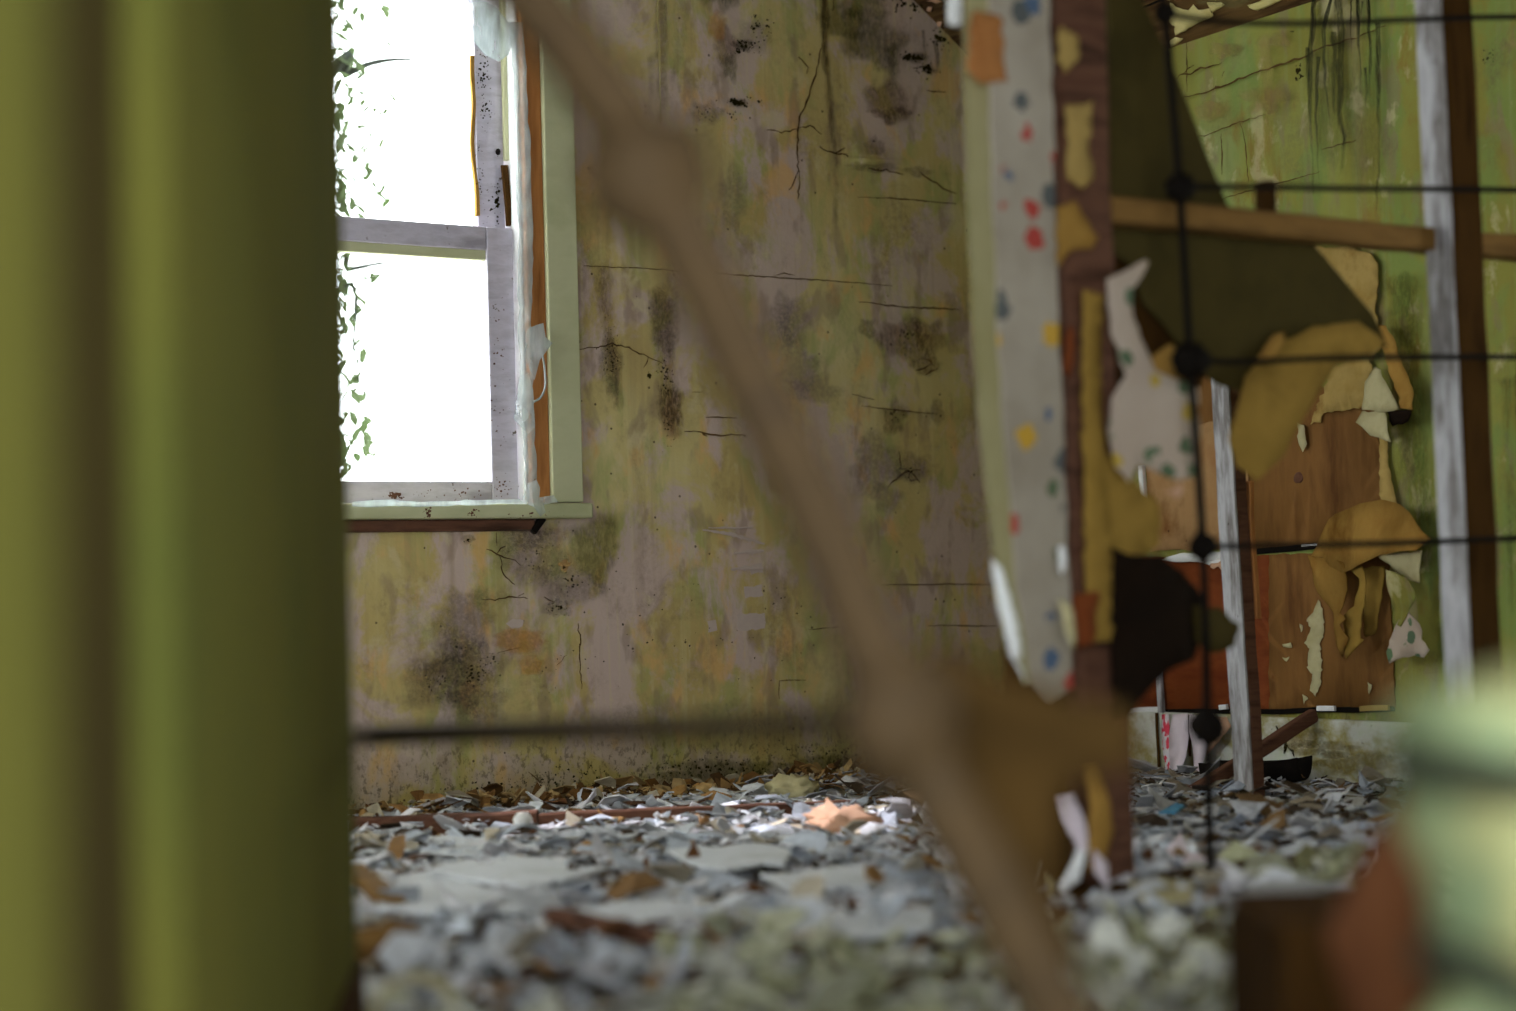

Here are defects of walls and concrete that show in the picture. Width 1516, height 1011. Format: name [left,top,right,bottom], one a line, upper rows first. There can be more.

flaking render [883,0,950,51]
water stain [900,46,940,80]
peeling [967,11,1009,84]
peeling [1168,0,1225,46]
peeling [1247,0,1281,11]
water stain [1290,0,1381,145]
crack [770,0,956,204]
crack [587,263,659,271]
crack [740,272,959,310]